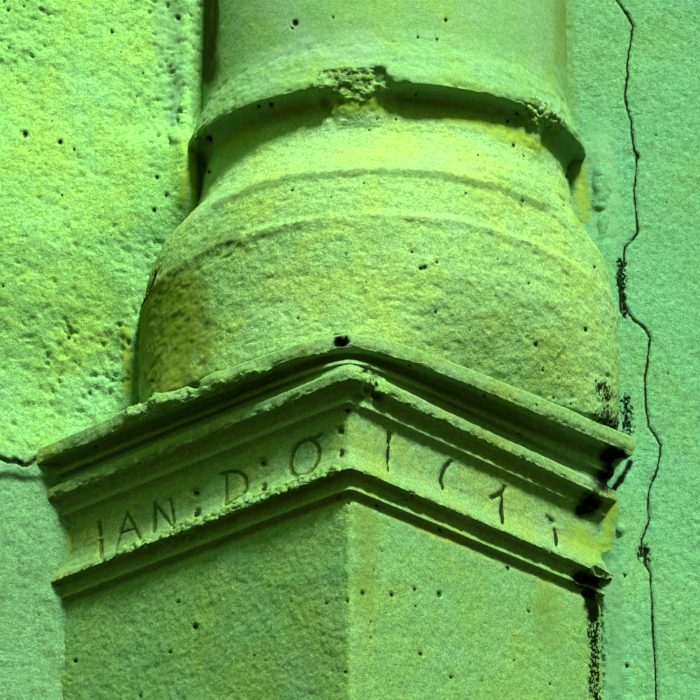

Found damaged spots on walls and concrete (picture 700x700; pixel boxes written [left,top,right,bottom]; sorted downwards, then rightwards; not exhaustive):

spalling [312,64,393,102]
spalling [516,95,565,136]
crack [617,0,662,700]
mould [591,378,636,435]
crack [0,458,36,467]
water stain [575,445,633,516]
water stain [571,572,603,700]